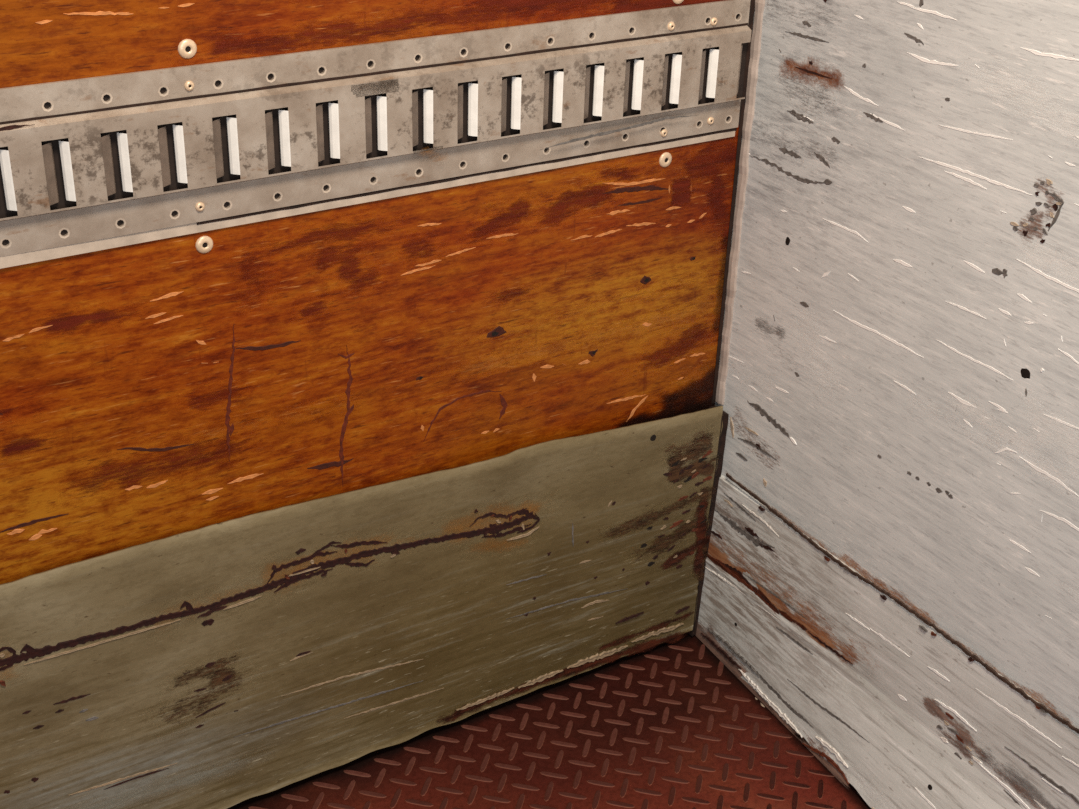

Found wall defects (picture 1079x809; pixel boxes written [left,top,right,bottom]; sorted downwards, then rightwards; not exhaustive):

rust [785,59,842,98]
peeling [1010,179,1064,243]
crack [307,345,354,483]
crack [0,508,540,686]
peeling [923,698,988,765]